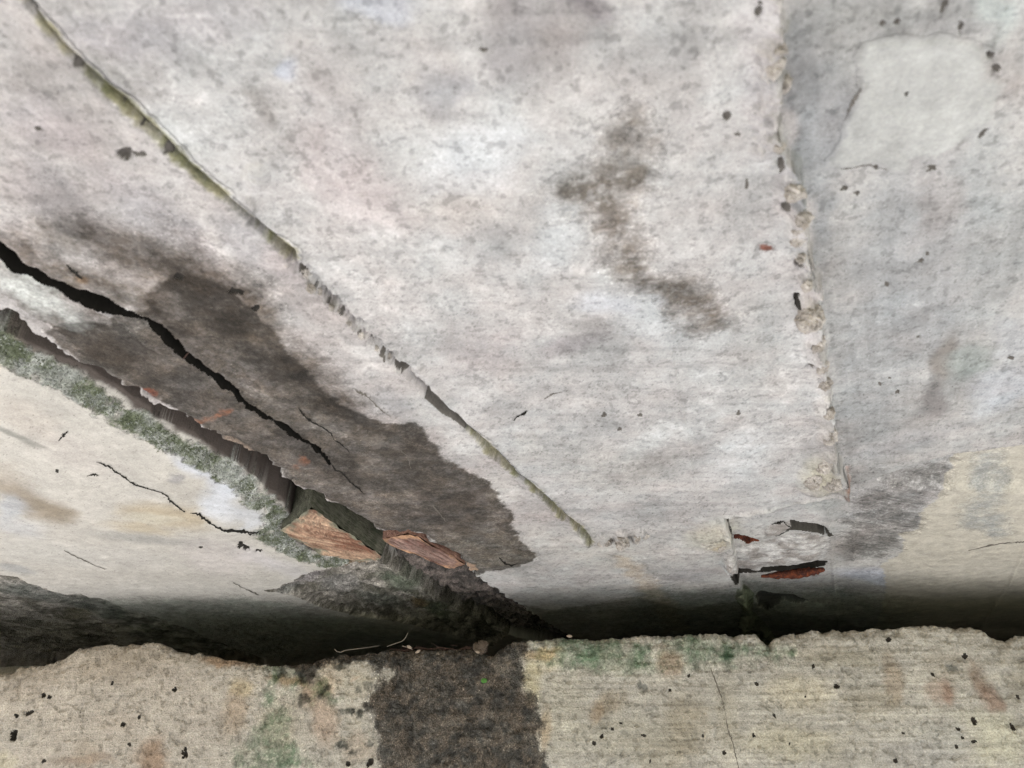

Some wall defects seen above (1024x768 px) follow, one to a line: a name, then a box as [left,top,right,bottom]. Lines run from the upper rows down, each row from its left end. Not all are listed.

water stain [526,94,764,340]
crack [0,241,363,493]
water stain [0,205,542,576]
spalling [222,434,257,451]
crack [87,462,265,536]
spalling [0,575,125,667]
spalling [264,543,510,646]
spalling [720,518,834,585]
water stain [275,641,552,768]